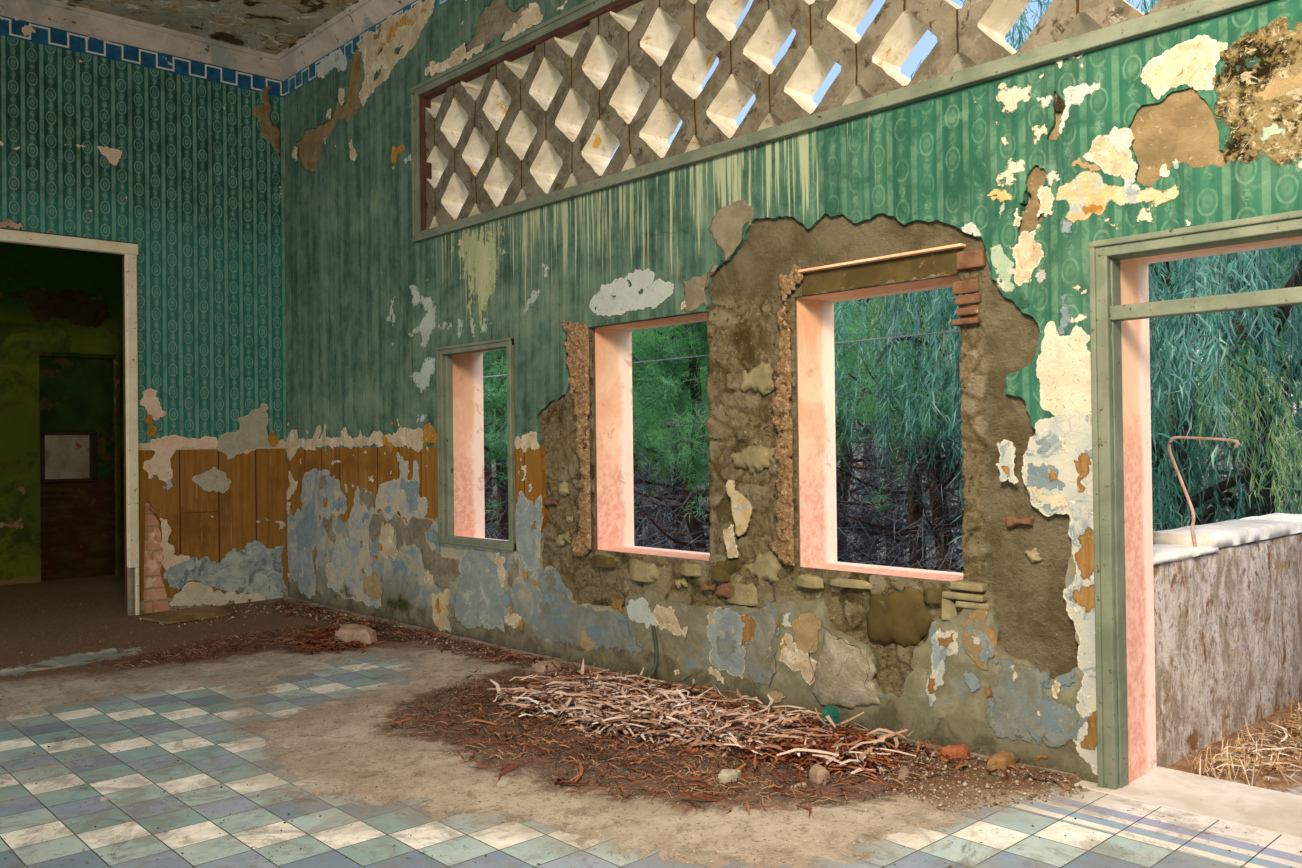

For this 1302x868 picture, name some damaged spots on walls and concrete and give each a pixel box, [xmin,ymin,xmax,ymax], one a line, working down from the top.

peeling [241,0,435,172]
flaking render [425,0,567,77]
flaking render [140,35,1228,775]